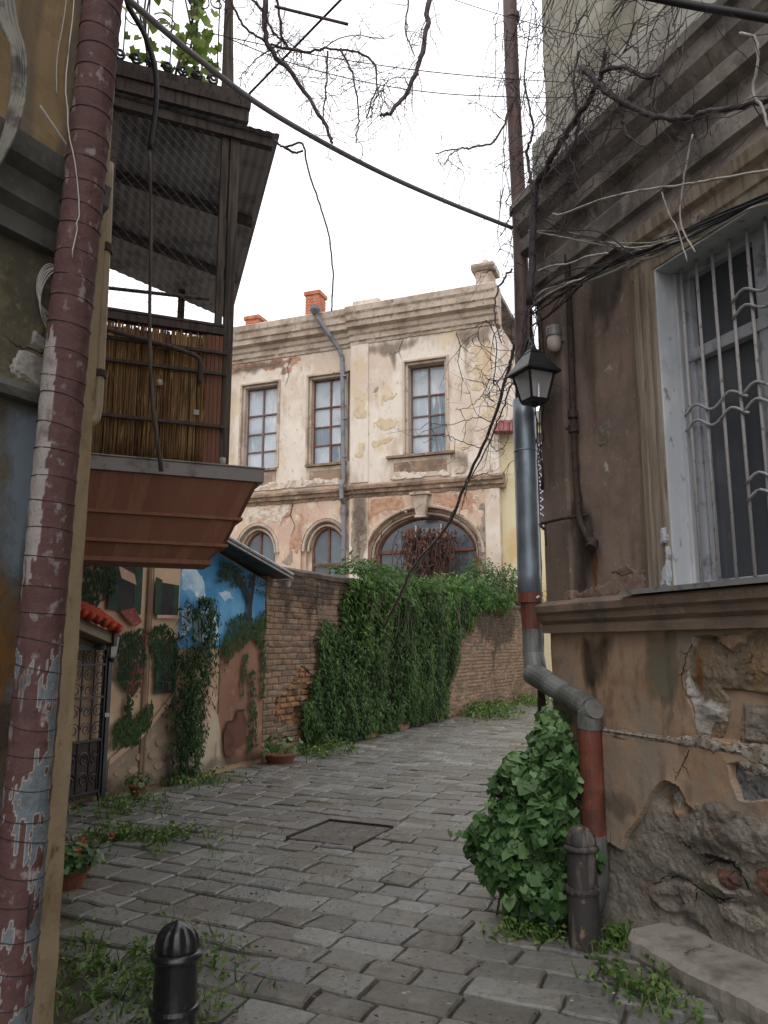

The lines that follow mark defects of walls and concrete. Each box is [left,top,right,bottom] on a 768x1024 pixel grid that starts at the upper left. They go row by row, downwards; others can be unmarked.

peeling [9,329,45,388]
peeling [232,356,301,375]
peeling [353,385,398,458]
peeling [3,410,38,576]
spalling [273,667,317,726]
water stain [583,640,607,685]
spalling [601,631,768,801]
crack [678,644,692,697]
spalling [600,783,768,964]